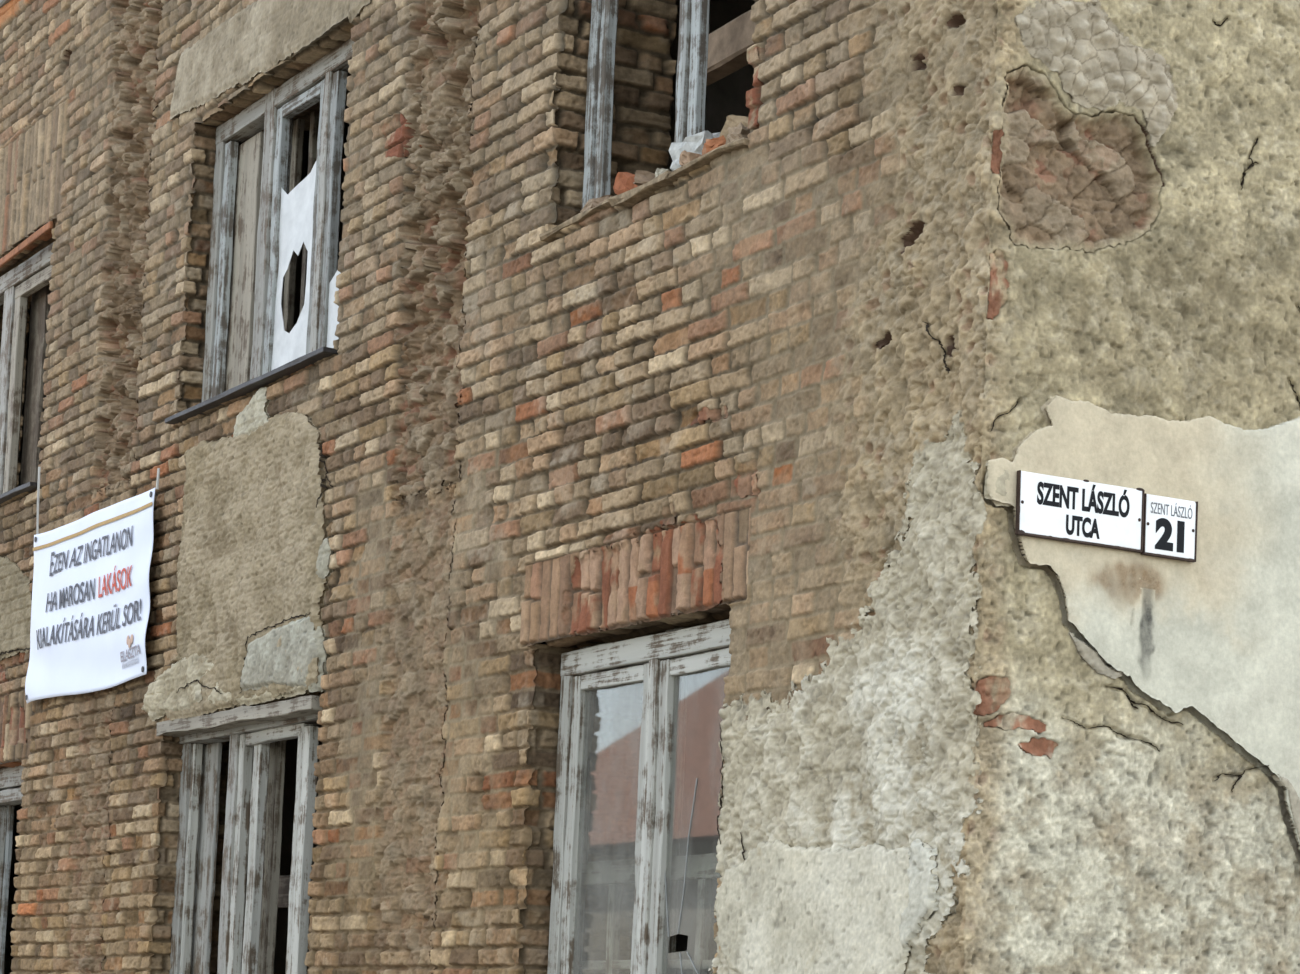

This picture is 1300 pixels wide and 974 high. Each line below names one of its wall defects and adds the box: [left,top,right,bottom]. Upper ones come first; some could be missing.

spalling [987,66,1164,320]
crack [1240,138,1259,190]
flaking render [708,395,1300,974]
crack [1063,686,1183,751]
crack [1214,765,1269,792]